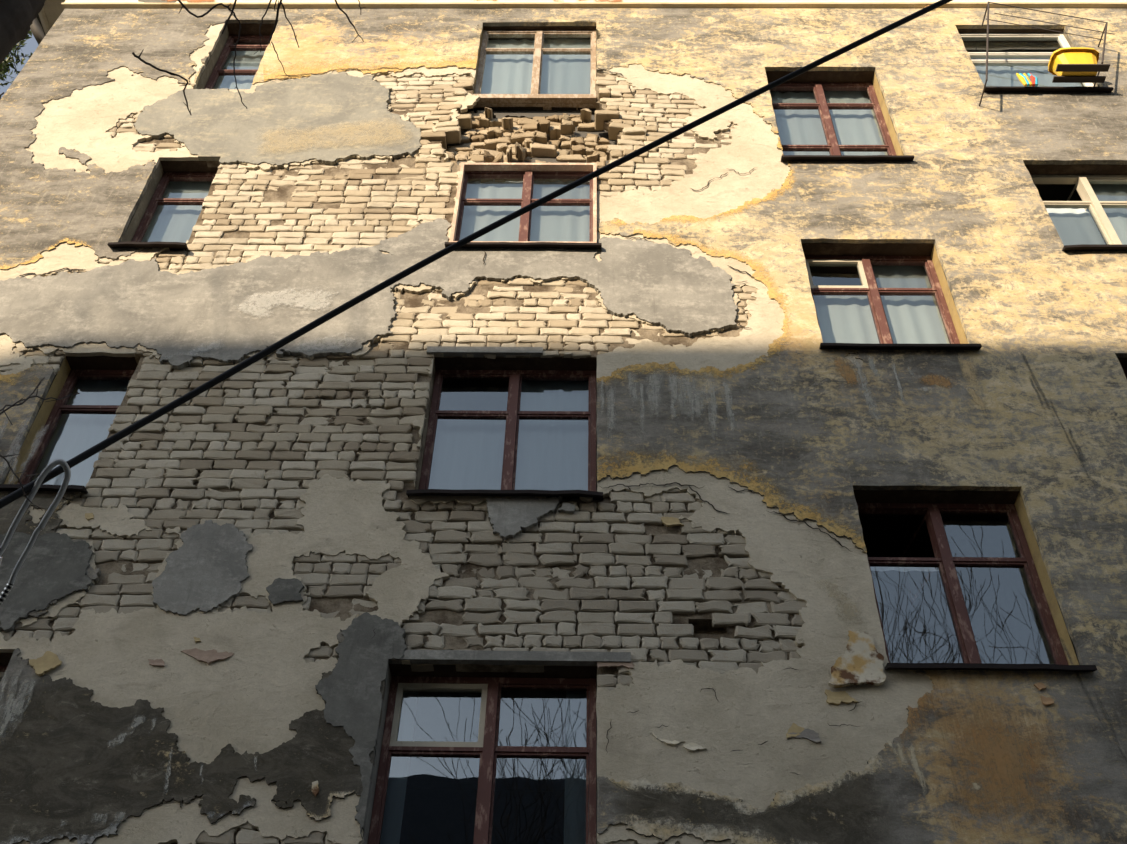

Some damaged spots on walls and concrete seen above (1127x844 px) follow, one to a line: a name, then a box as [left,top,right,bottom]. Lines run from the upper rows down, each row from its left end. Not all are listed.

flaking render [0,23,480,280]
water stain [628,373,734,434]
flaking render [0,64,933,815]
flaking render [8,777,364,844]
peeling [597,816,776,844]